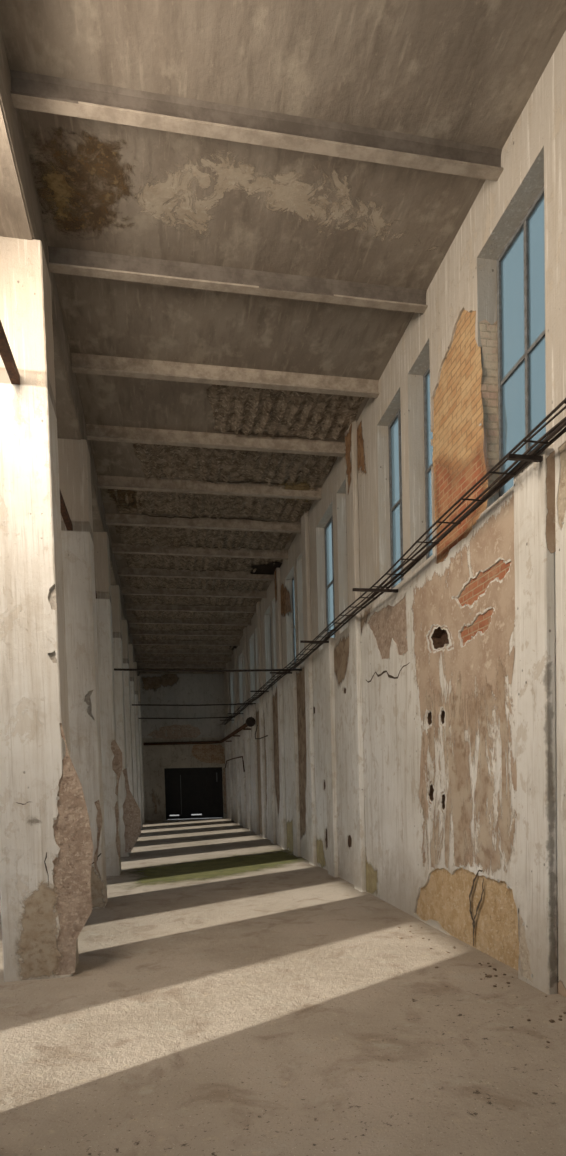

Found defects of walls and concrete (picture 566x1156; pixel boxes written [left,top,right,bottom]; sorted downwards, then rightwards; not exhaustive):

water stain [30,127,403,242]
spalling [84,691,95,720]
flaking render [368,309,533,981]
spalling [52,723,141,976]